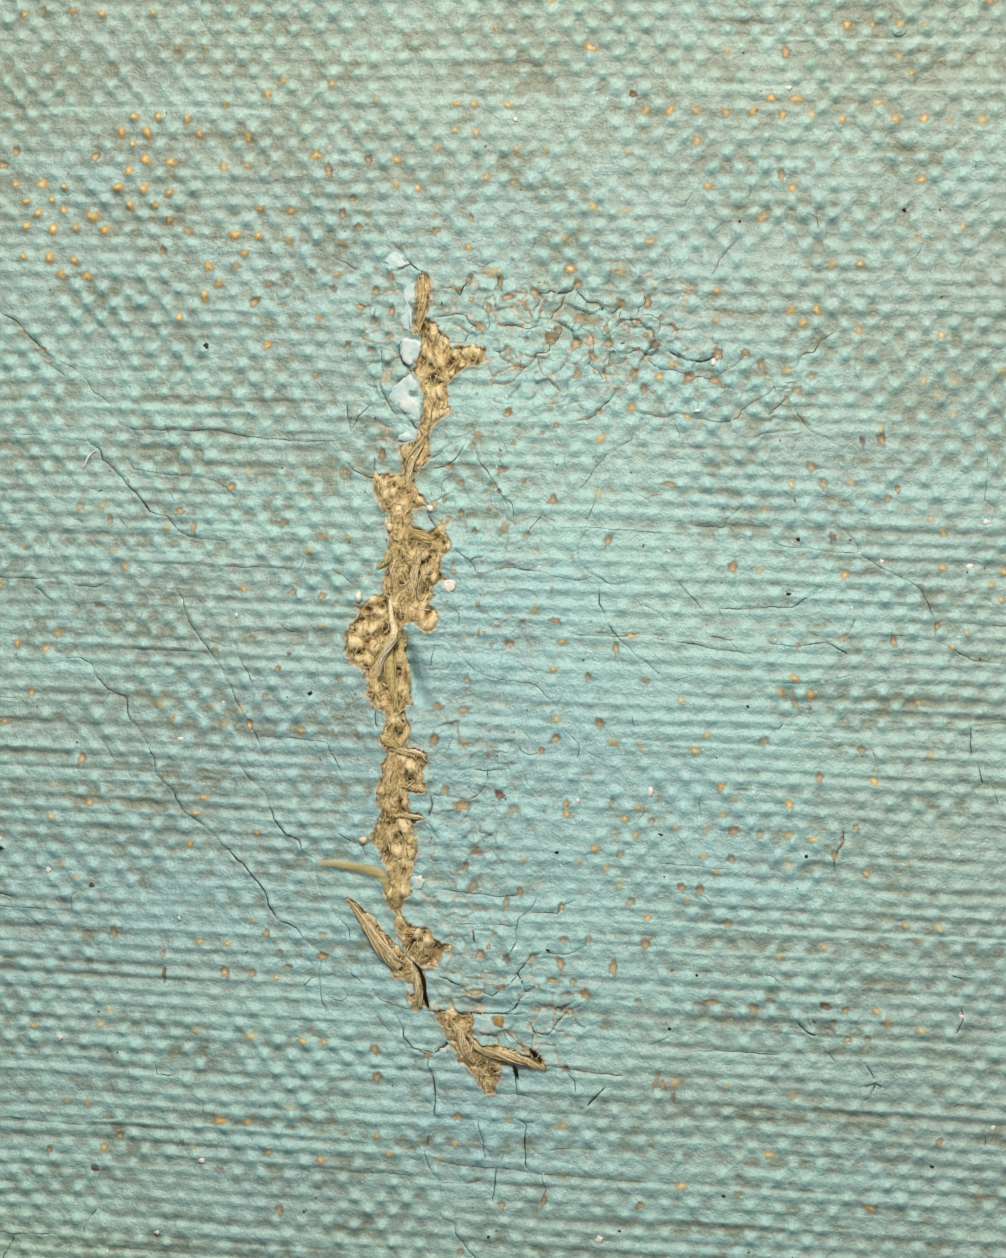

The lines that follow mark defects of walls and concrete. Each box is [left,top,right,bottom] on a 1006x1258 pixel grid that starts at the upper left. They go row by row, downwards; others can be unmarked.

crack [0,576,100,601]
crack [74,657,132,721]
crack [80,439,261,568]
crack [171,592,340,769]
crack [352,458,388,478]
peeling [318,251,546,1095]
crack [428,265,832,537]
crack [150,750,306,940]
crack [271,809,315,858]
crack [352,860,642,1203]